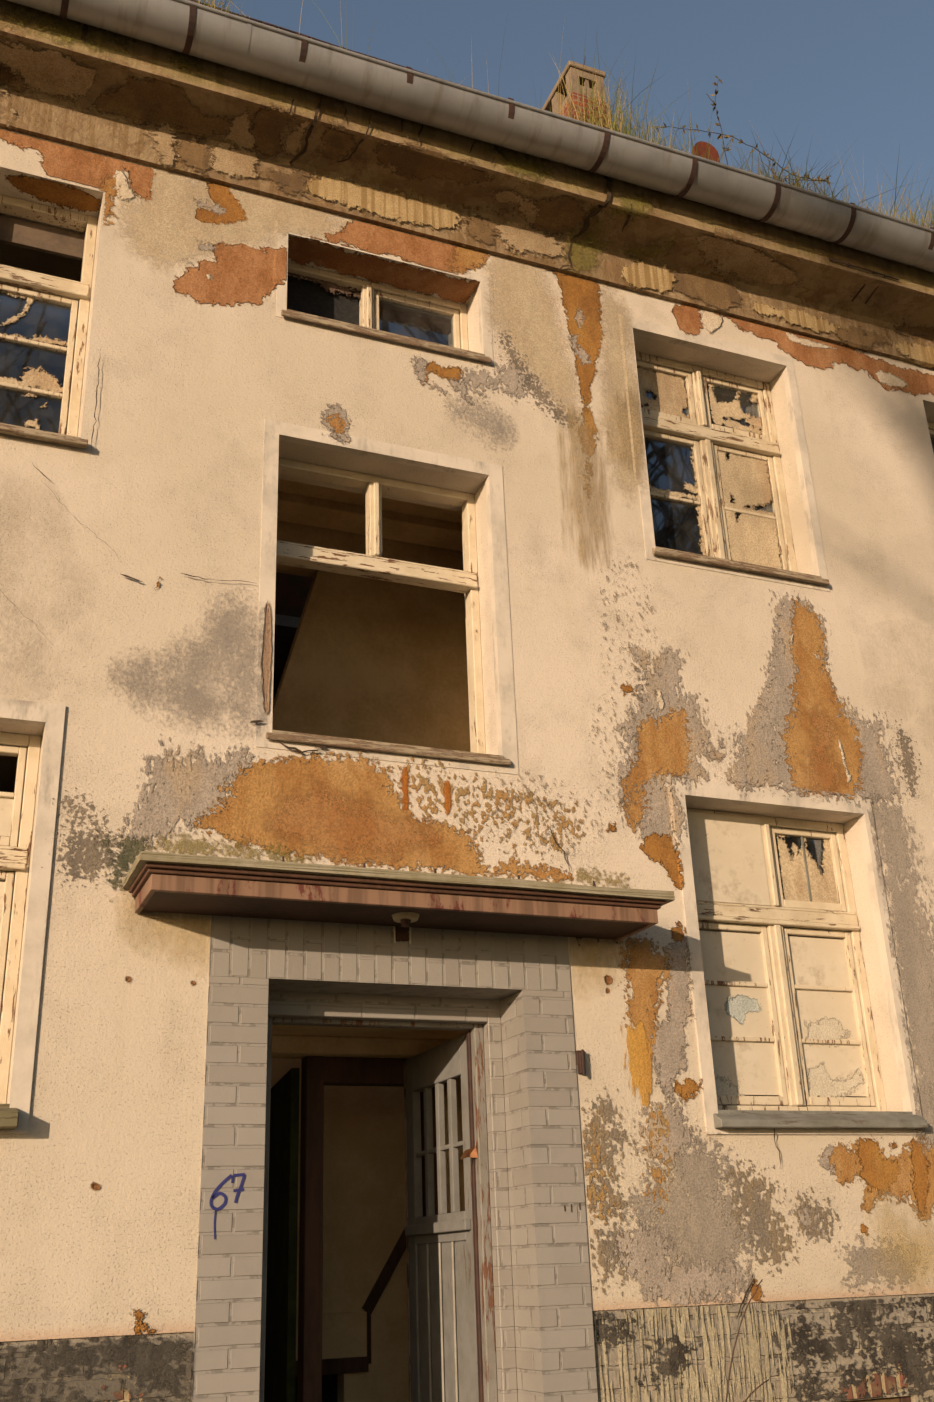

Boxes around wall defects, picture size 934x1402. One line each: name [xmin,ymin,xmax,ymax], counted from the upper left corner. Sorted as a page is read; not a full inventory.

peeling [0,38,589,306]
damp [110,593,263,728]
spalling [121,557,934,1238]
peeling [581,921,840,1306]
damp [594,1303,794,1402]